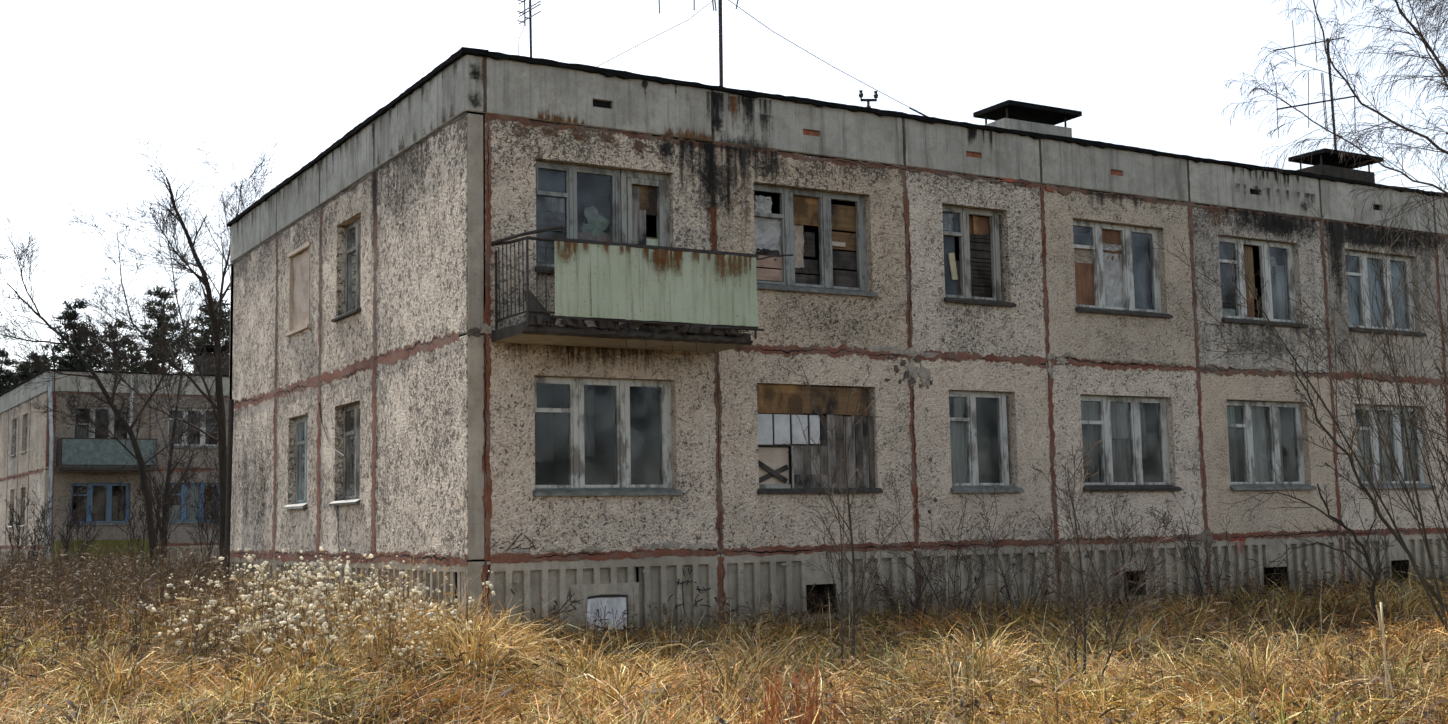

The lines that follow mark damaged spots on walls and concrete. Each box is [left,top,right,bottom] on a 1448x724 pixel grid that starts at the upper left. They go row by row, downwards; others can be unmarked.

leakage [659,91,786,221]
corrosion [557,207,751,279]
leakage [1212,183,1445,298]
spalling [866,344,933,389]